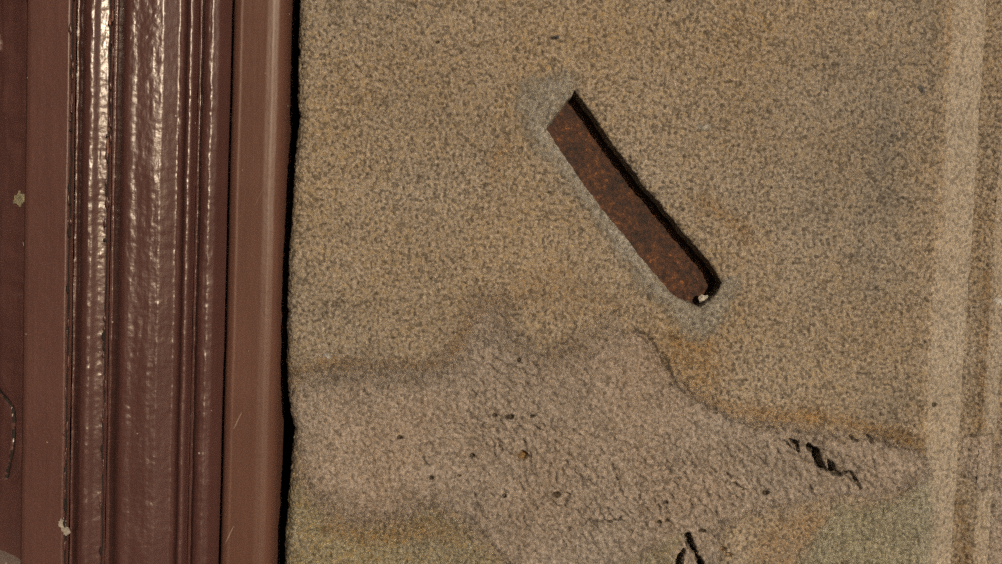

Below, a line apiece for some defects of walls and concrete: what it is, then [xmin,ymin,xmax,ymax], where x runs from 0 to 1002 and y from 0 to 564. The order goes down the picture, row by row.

spalling [288,292,931,564]
crack [788,439,859,486]